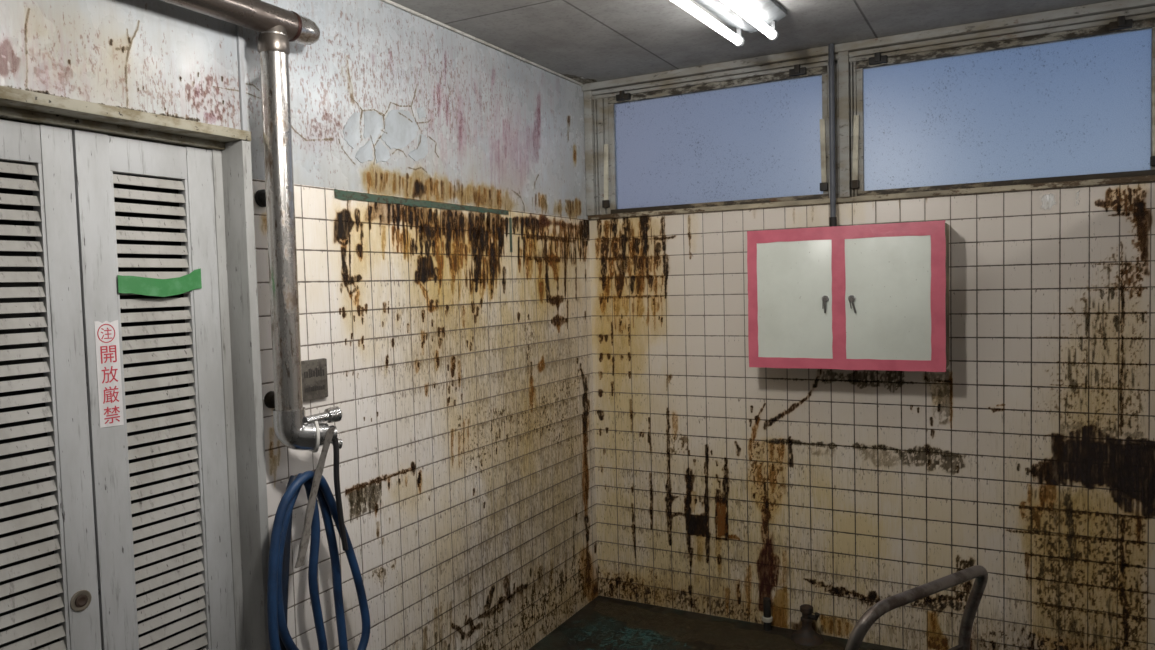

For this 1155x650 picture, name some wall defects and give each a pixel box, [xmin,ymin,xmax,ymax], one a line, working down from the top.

peeling [343,107,428,163]
water stain [345,461,430,521]
rust [334,172,675,595]
rust [649,369,822,616]
water stain [766,370,965,473]
water stain [980,243,1155,650]
water stain [435,531,757,650]
water stain [804,578,890,605]
water stain [911,555,974,617]